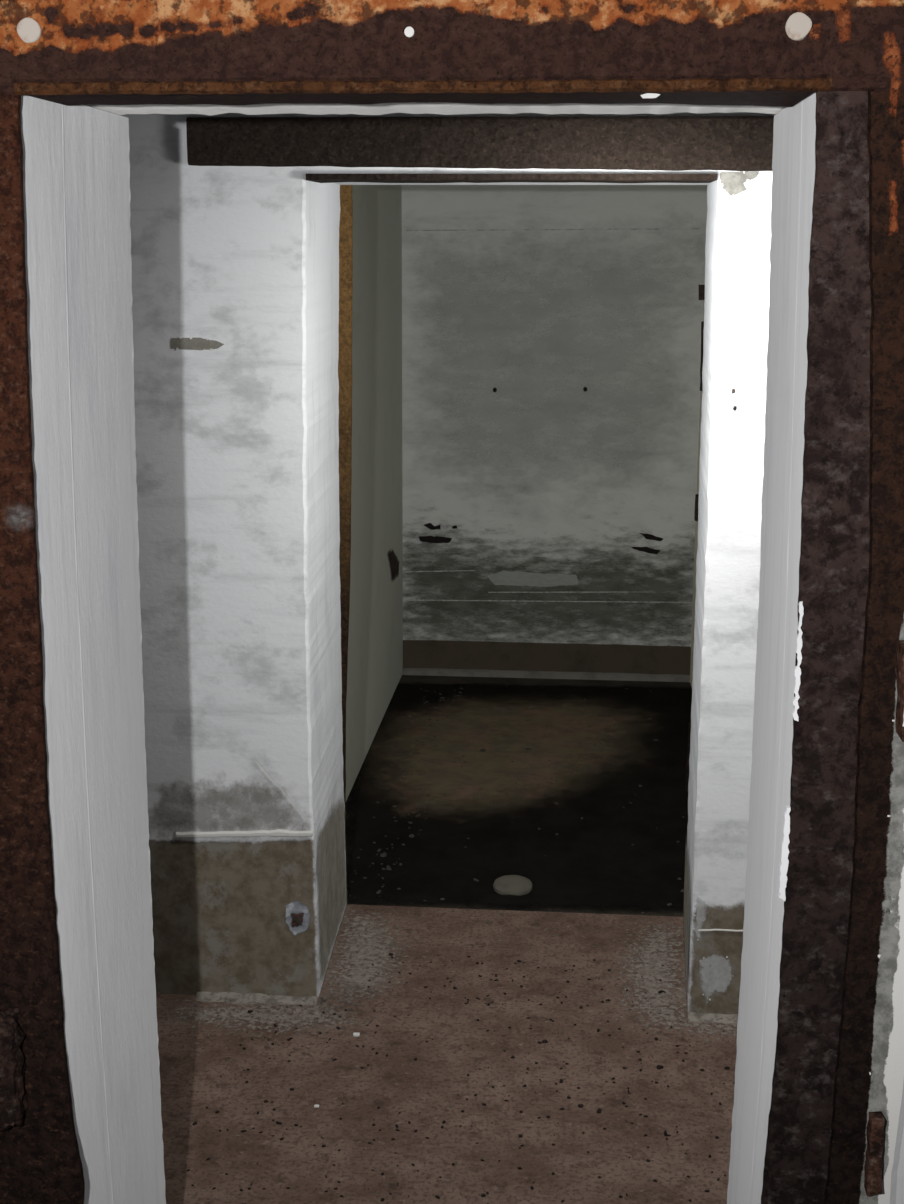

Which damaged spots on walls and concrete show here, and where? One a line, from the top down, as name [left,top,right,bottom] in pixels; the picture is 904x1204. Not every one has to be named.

corrosion [0,0,904,56]
corrosion [883,32,901,114]
corrosion [889,181,899,235]
water stain [403,531,694,646]